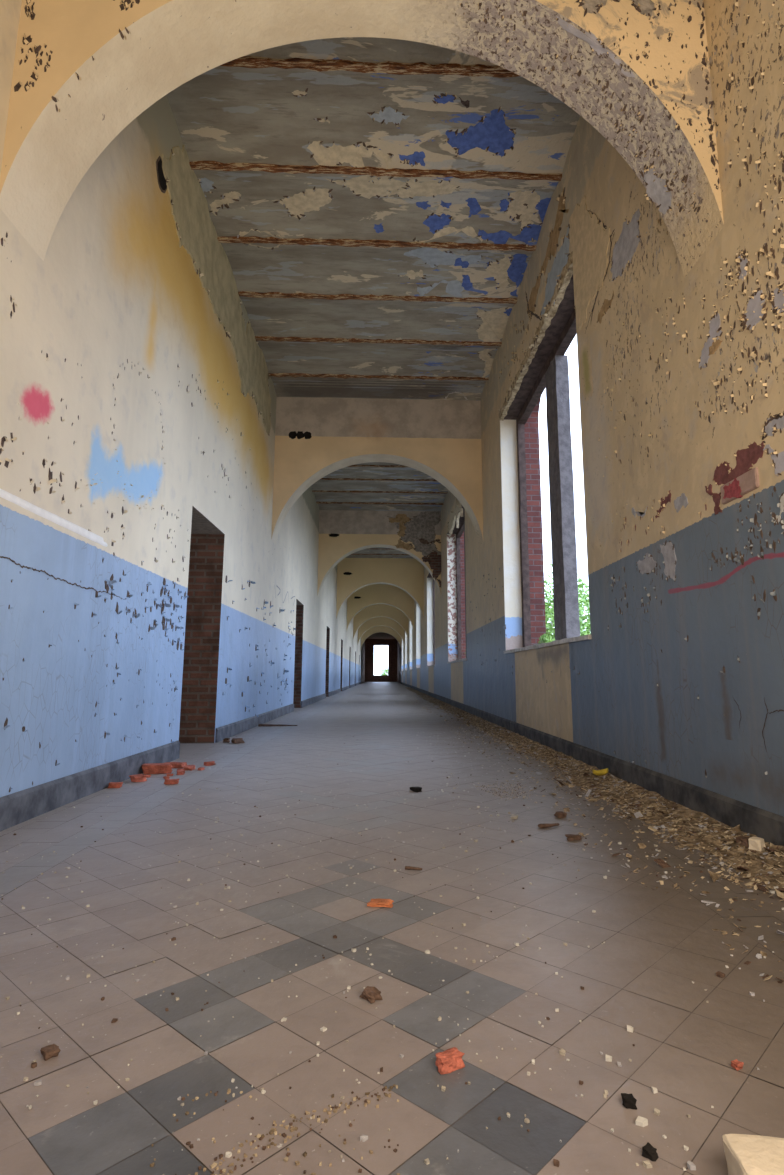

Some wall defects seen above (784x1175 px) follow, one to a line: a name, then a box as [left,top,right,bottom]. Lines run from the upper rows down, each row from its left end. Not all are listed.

peeling [24,0,35,20]
peeling [113,0,140,11]
peeling [14,33,53,92]
peeling [367,106,410,127]
peeling [432,93,470,108]
flaking render [161,145,271,436]
flaking render [387,497,463,588]
peeling [607,413,784,631]
crack [0,556,126,600]
crack [734,699,784,752]